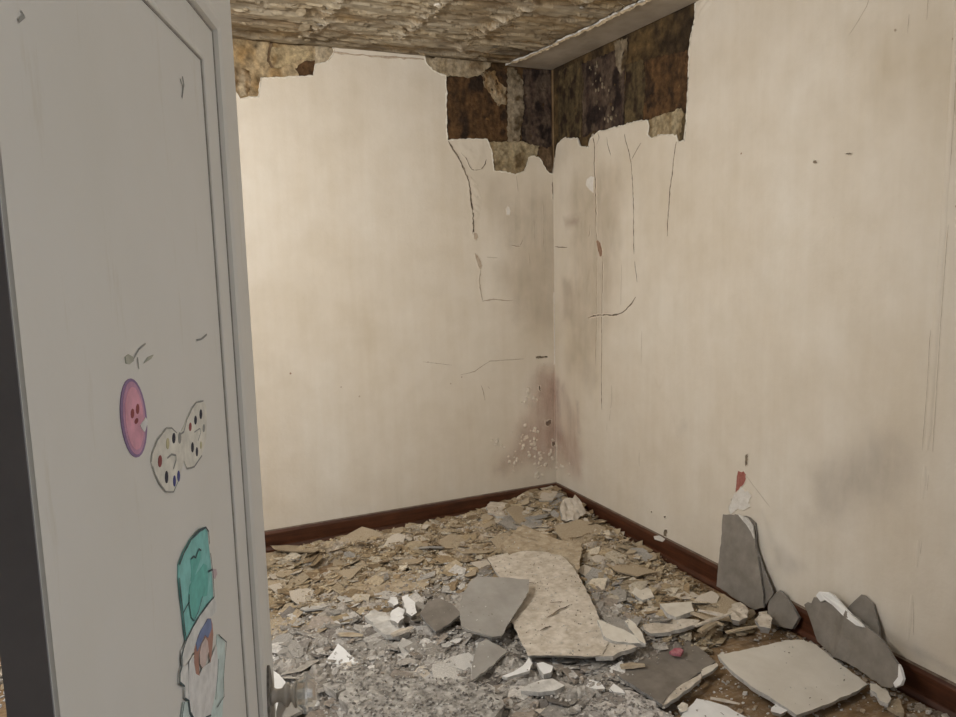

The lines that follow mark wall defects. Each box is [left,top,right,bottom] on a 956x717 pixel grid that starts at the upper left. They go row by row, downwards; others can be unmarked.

spalling [423,2,696,175]
crack [447,141,523,303]
crack [588,132,641,431]
crack [666,142,677,236]
spalling [728,469,752,515]